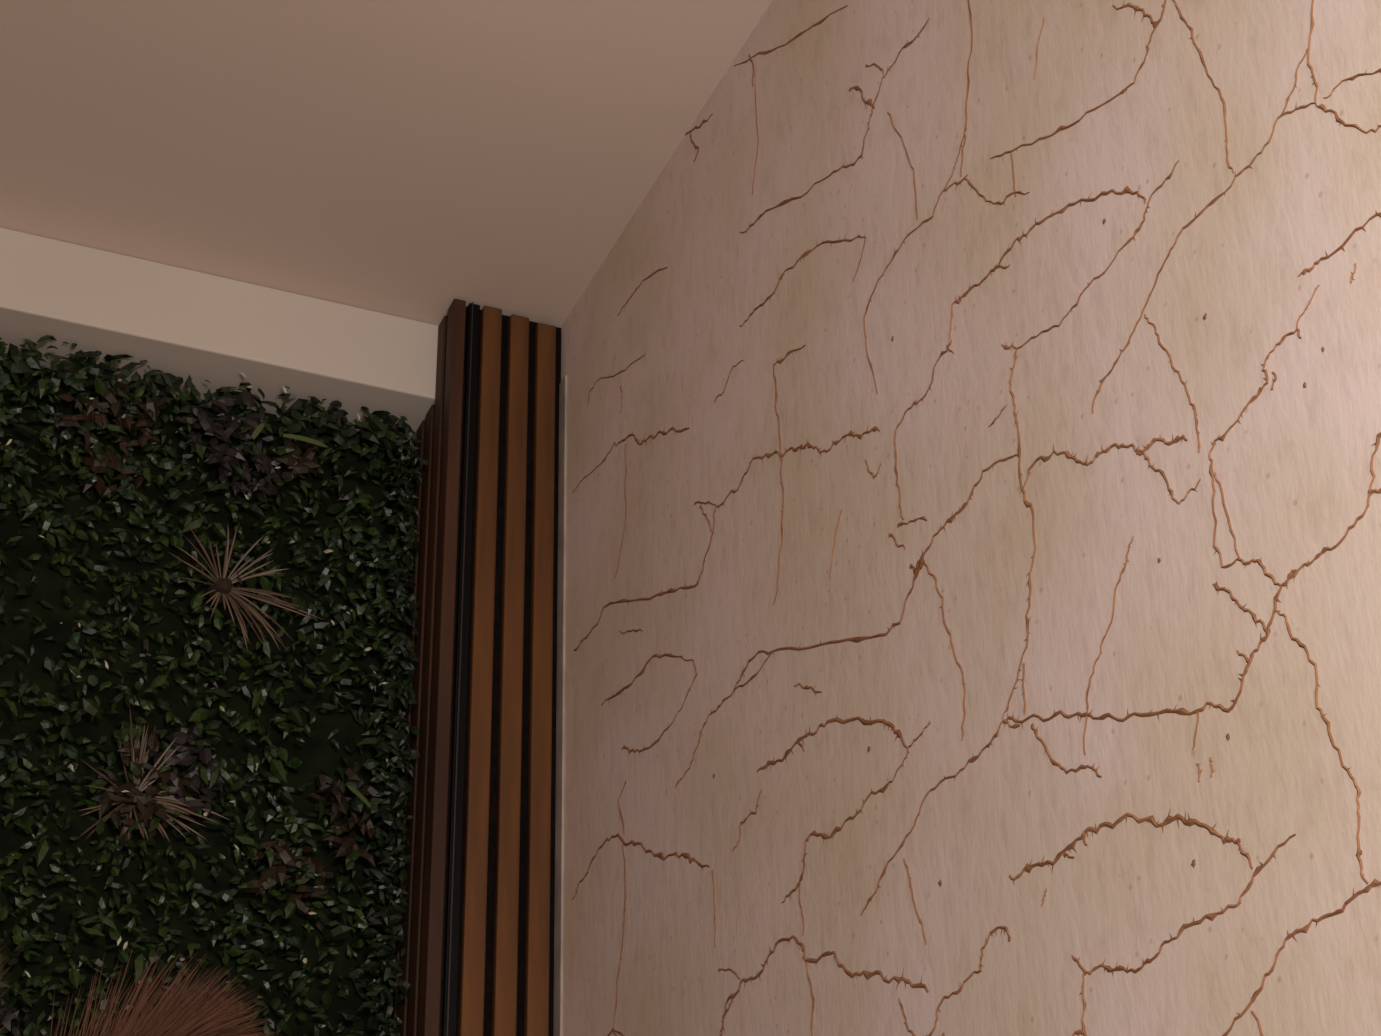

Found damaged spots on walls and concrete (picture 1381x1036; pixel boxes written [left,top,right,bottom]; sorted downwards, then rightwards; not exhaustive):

crack [572,0,1381,1036]